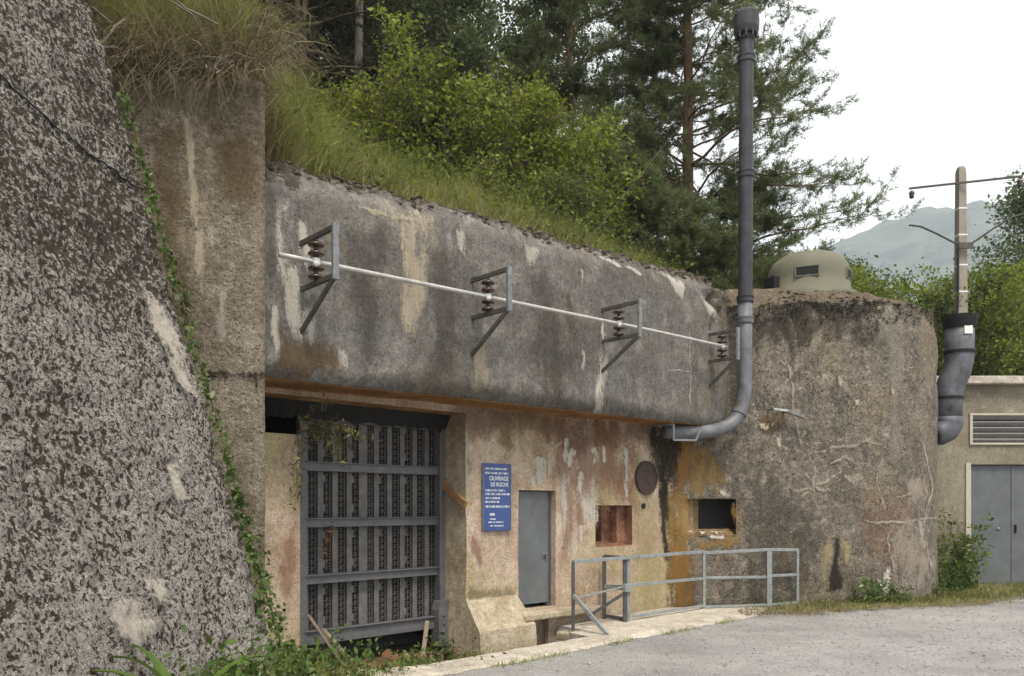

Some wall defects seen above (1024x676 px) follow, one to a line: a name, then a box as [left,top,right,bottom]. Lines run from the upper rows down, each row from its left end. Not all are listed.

spalling [140,284,196,394]
corrosion [553,420,640,548]
leakage [650,427,682,560]
corrosion [666,441,702,607]
leakage [829,537,843,591]
crack [780,358,937,571]